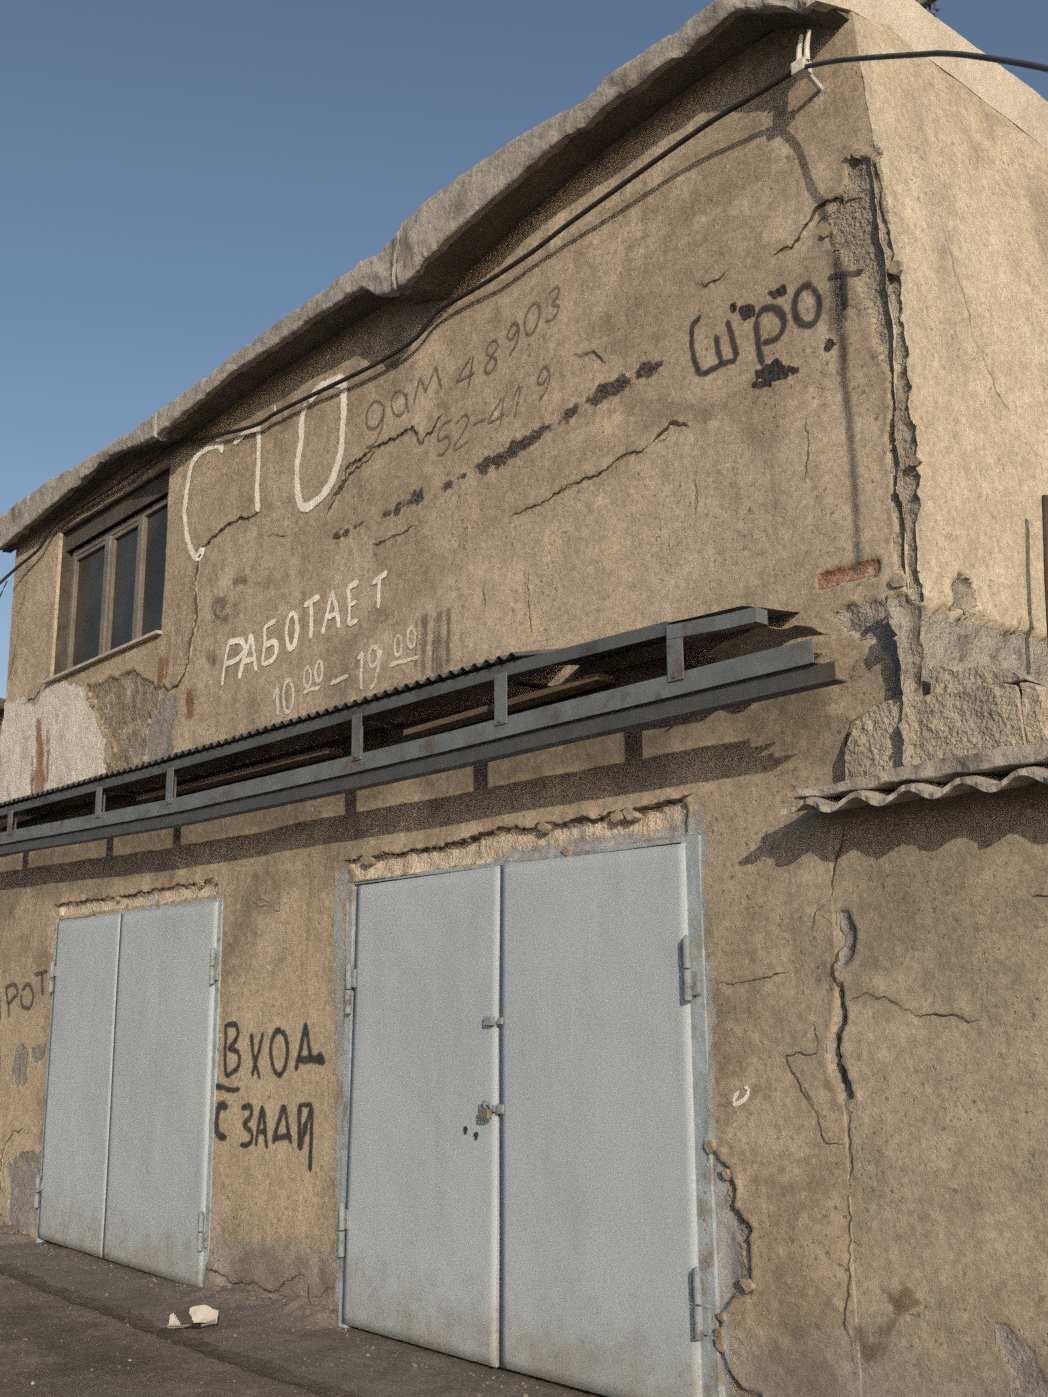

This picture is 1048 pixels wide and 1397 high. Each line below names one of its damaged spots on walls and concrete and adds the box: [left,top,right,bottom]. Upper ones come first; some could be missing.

crack [772,197,864,256]
crack [325,413,443,519]
crack [511,420,690,516]
spalling [820,144,1048,766]
crack [169,512,288,690]
rust [31,720,49,794]
spalling [84,670,168,772]
crack [343,793,692,862]
spalling [827,909,856,1101]
crack [786,823,976,1387]
spalling [5,1150,42,1235]
spalling [704,1140,755,1353]